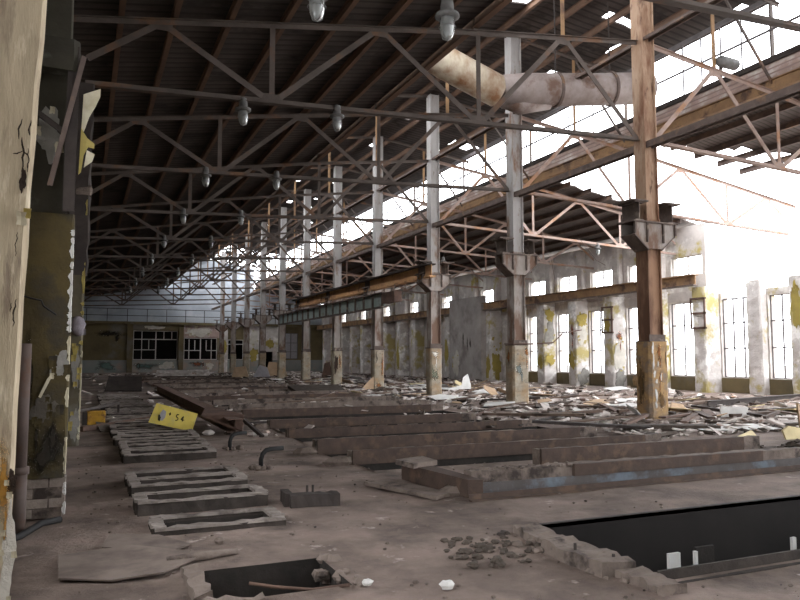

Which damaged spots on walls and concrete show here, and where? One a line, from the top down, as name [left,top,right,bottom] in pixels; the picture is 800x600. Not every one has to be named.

crack [13,120,32,172]
peeling [36,106,64,164]
peeling [29,230,85,514]
peeling [652,334,670,408]